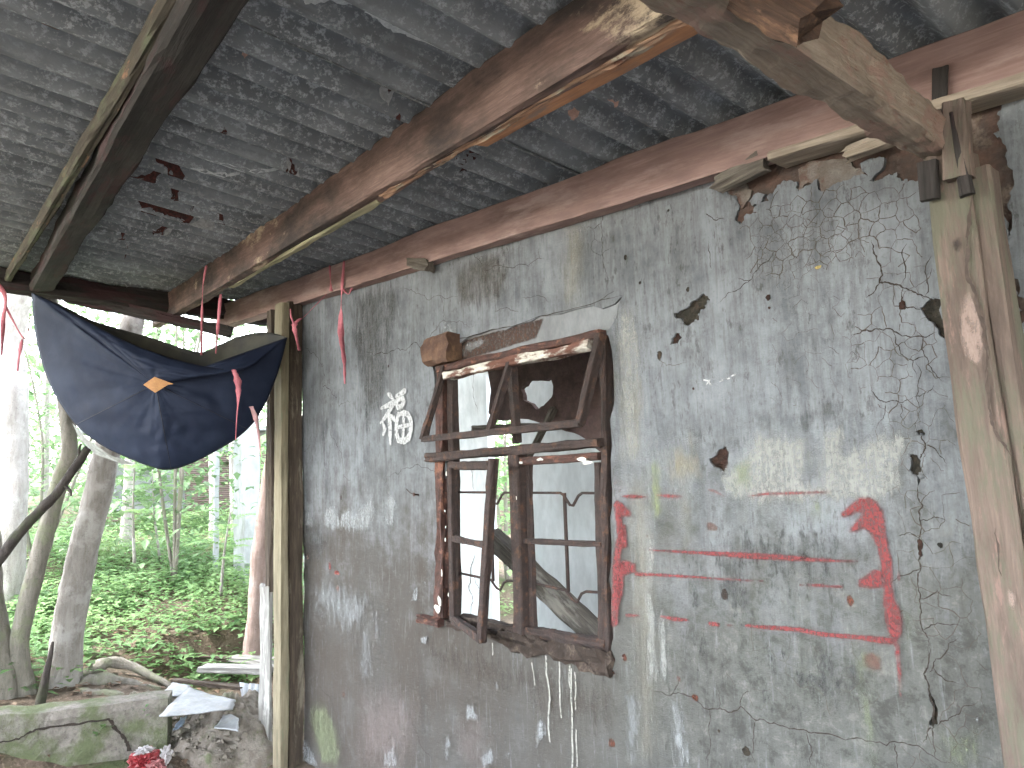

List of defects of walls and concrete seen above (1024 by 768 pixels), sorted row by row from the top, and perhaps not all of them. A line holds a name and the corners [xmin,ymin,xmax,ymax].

flaking render [727,146,924,228]
flaking render [971,105,1017,245]
spalling [670,287,710,344]
spalling [921,297,945,339]
flaking render [1015,279,1024,323]
peeling [711,428,925,504]
crack [638,184,1002,768]